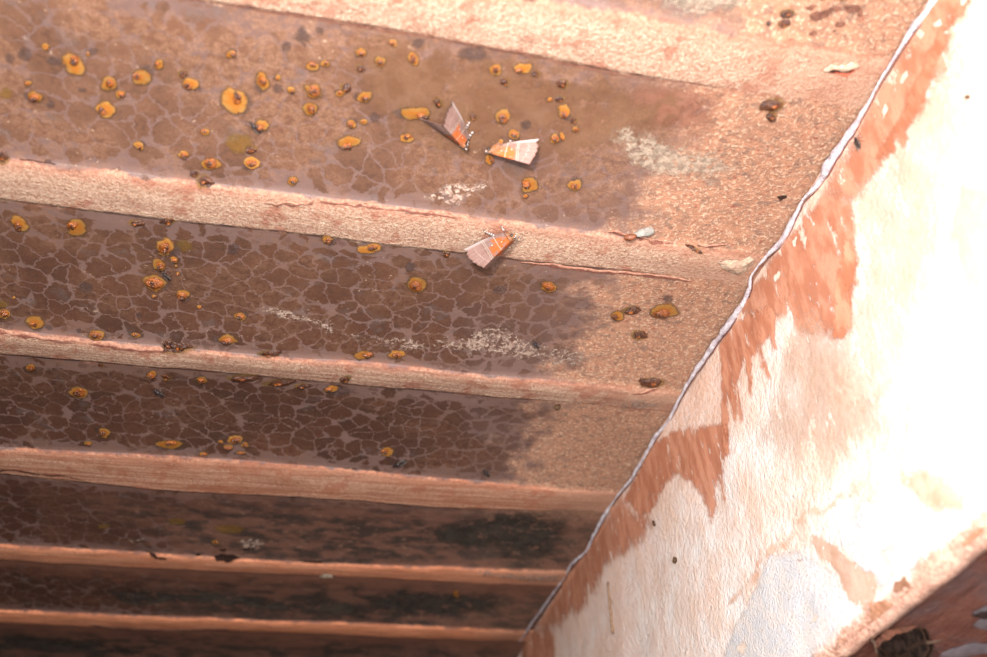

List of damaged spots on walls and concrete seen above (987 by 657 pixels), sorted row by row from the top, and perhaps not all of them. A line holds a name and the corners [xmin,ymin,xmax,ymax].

crack [196,0,734,92]
spalling [823,62,859,77]
damp [365,46,732,186]
crack [264,198,459,219]
corrosion [141,237,191,298]
crack [0,328,169,353]
damp [353,325,592,365]
corrosion [610,303,679,321]
damp [480,0,970,657]
corrosion [638,378,663,388]
peeling [725,553,847,657]
peeling [940,642,987,657]